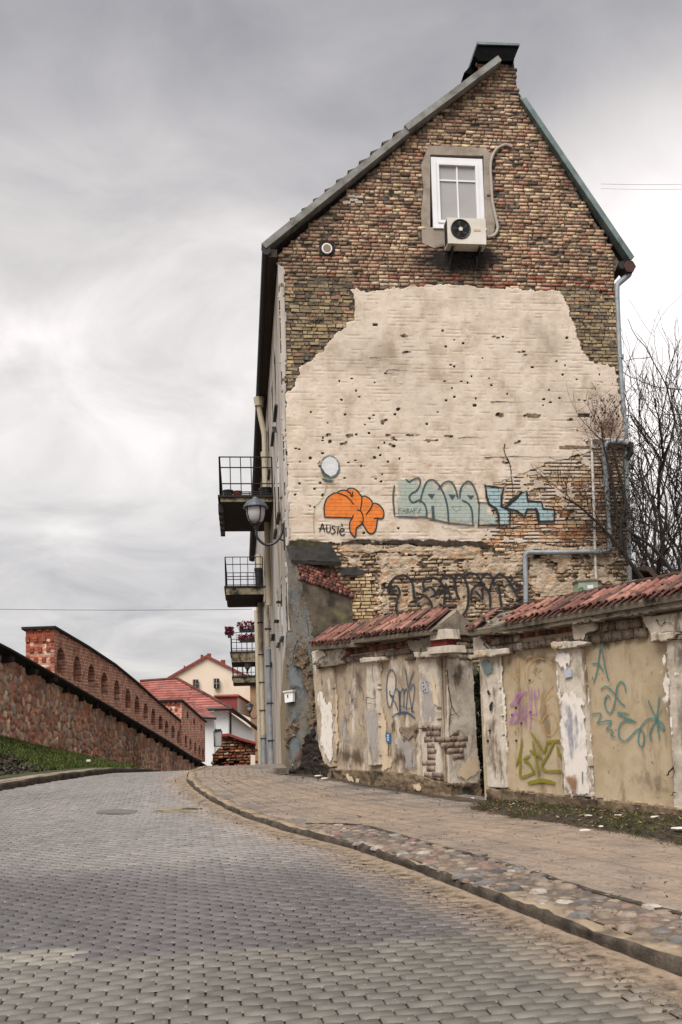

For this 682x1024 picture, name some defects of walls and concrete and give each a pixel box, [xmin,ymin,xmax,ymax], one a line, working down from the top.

flaking render [278,277,355,394]
flaking render [556,287,618,375]
spalling [283,408,453,483]
flaking render [474,445,627,547]
flaking render [294,553,355,600]
spalling [284,642,359,783]
flaking render [380,673,482,796]
peeling [551,642,594,797]
peeling [662,655,679,734]